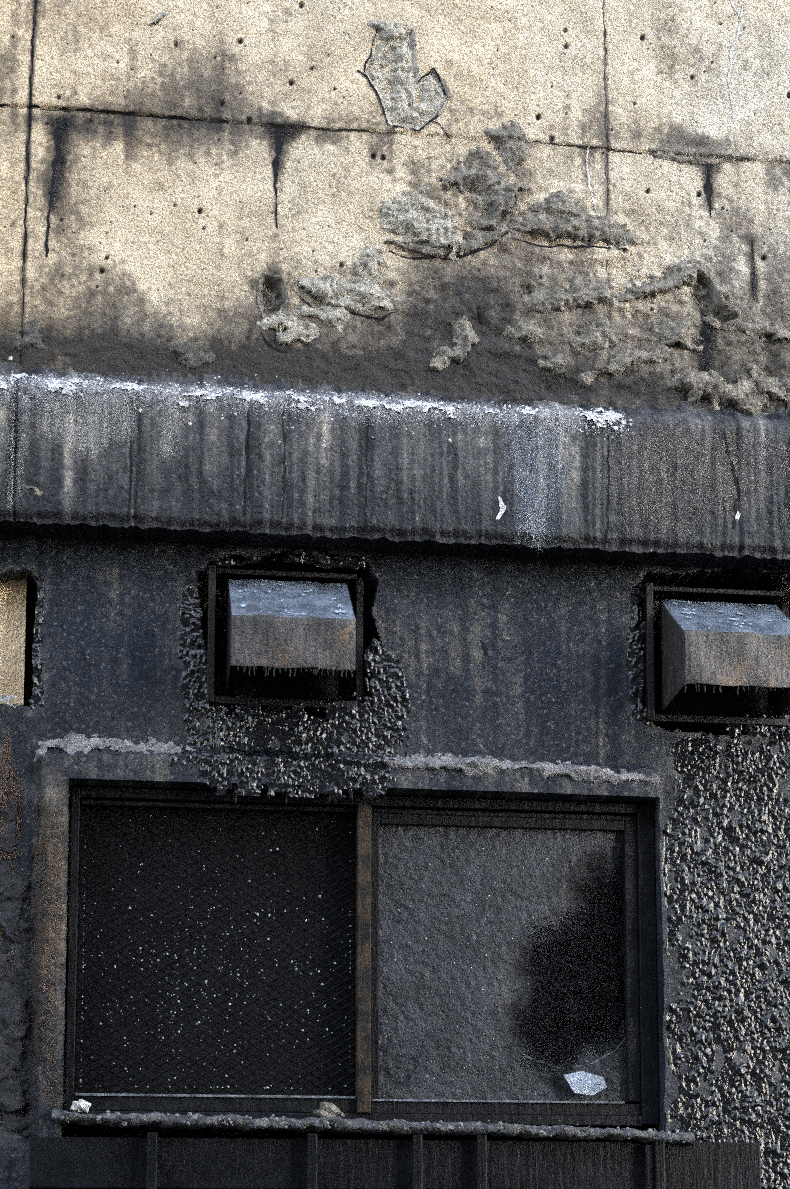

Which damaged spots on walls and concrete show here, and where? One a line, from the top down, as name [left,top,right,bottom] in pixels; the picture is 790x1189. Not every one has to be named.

spalling [357,19,451,141]
spalling [647,142,760,165]
peeling [257,245,393,346]
spalling [691,281,716,316]
damp [0,377,592,449]
peeling [0,318,632,449]
crack [723,429,740,529]
spalling [0,695,17,708]